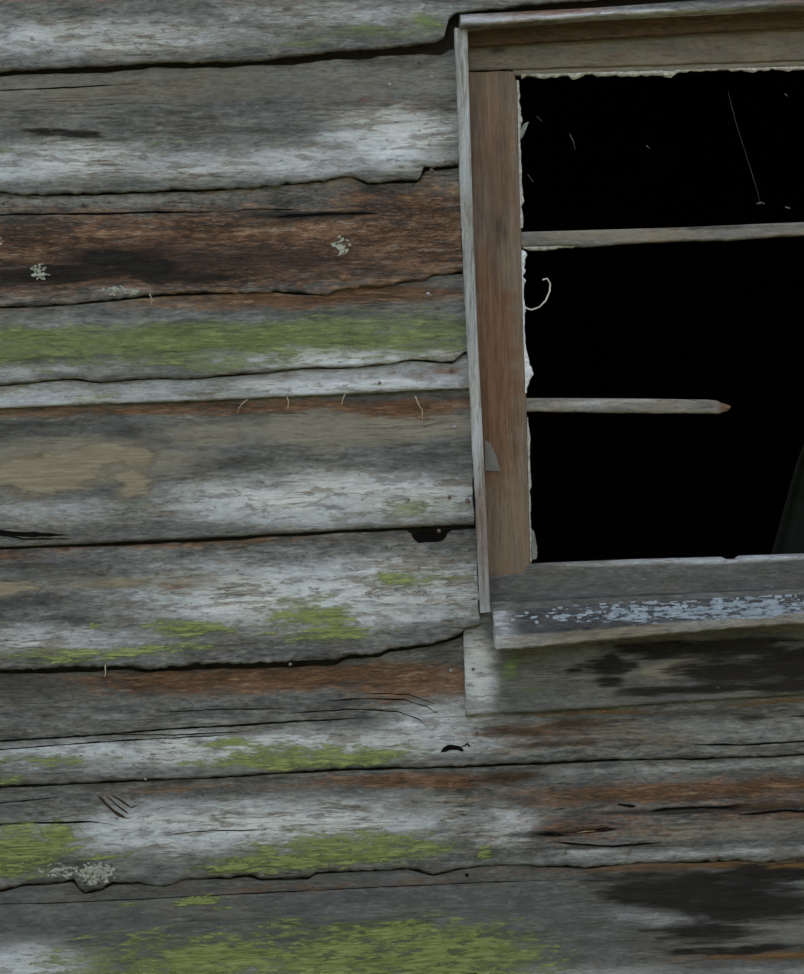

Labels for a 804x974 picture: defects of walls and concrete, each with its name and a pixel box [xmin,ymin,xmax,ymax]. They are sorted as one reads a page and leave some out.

peeling [511,594,804,625]
water stain [566,637,804,696]
crack [538,804,804,848]
water stain [584,860,804,955]